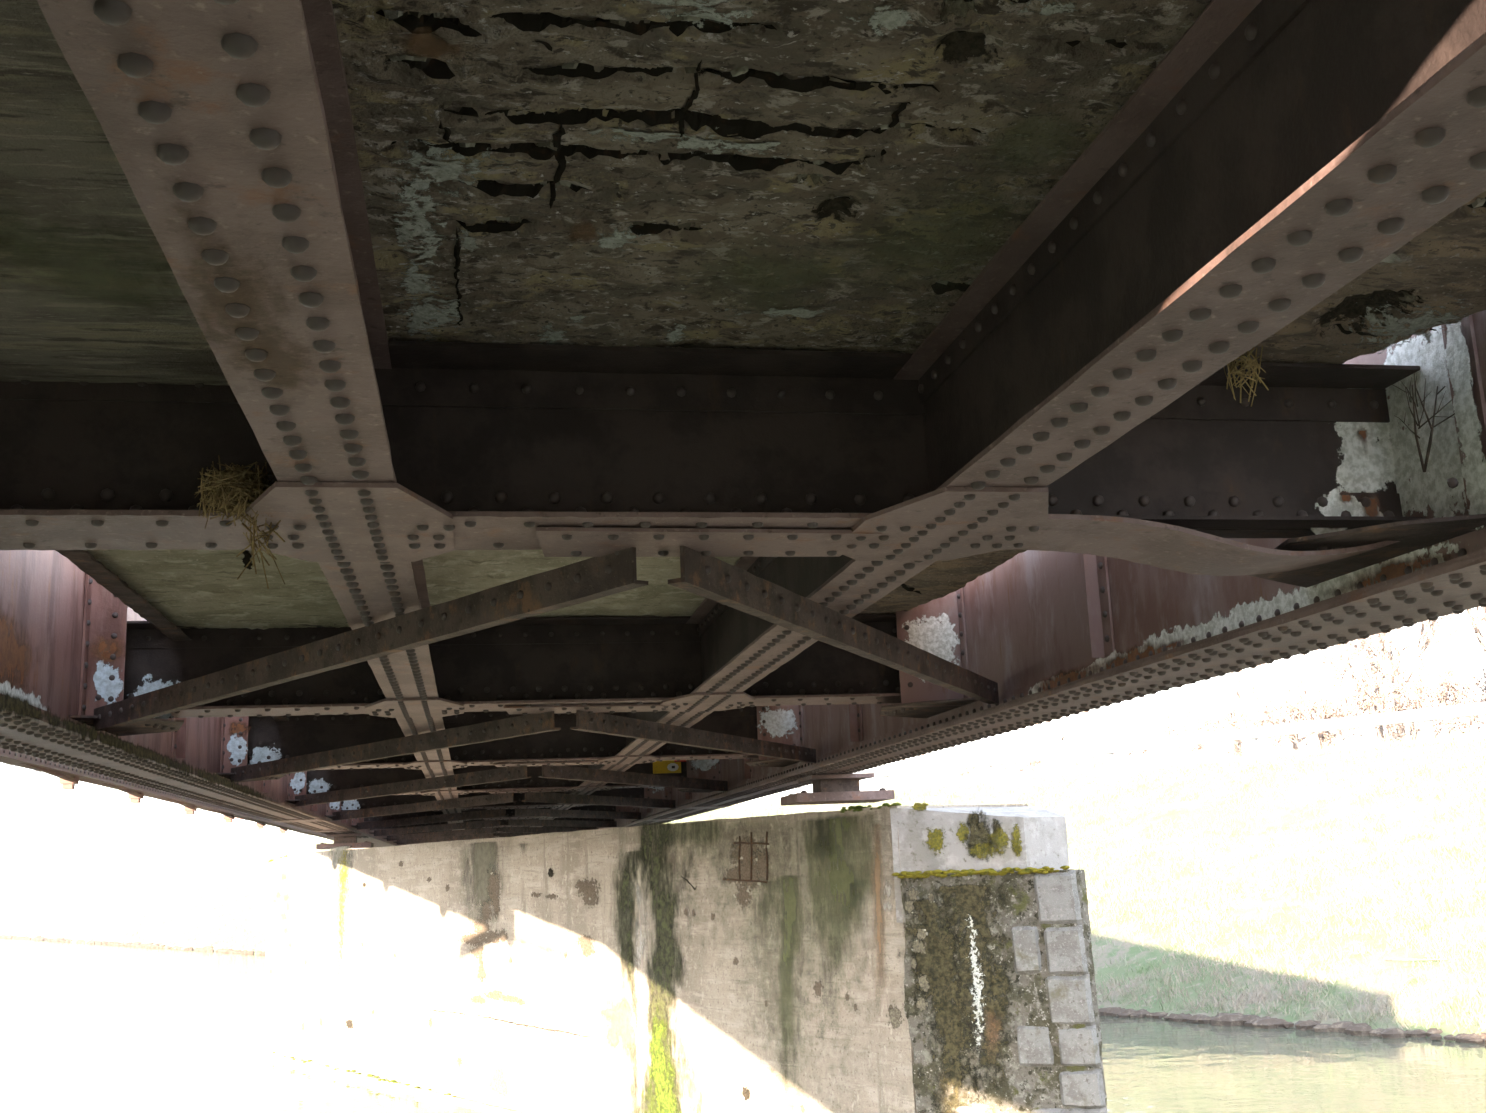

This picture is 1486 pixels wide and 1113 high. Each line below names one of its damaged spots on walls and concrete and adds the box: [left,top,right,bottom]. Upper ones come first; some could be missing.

crack [1066,36,1128,48]
crack [376,9,986,325]
spalling [1315,289,1426,337]
water stain [464,842,498,924]
water stain [601,816,892,1113]
water stain [965,914,986,1053]